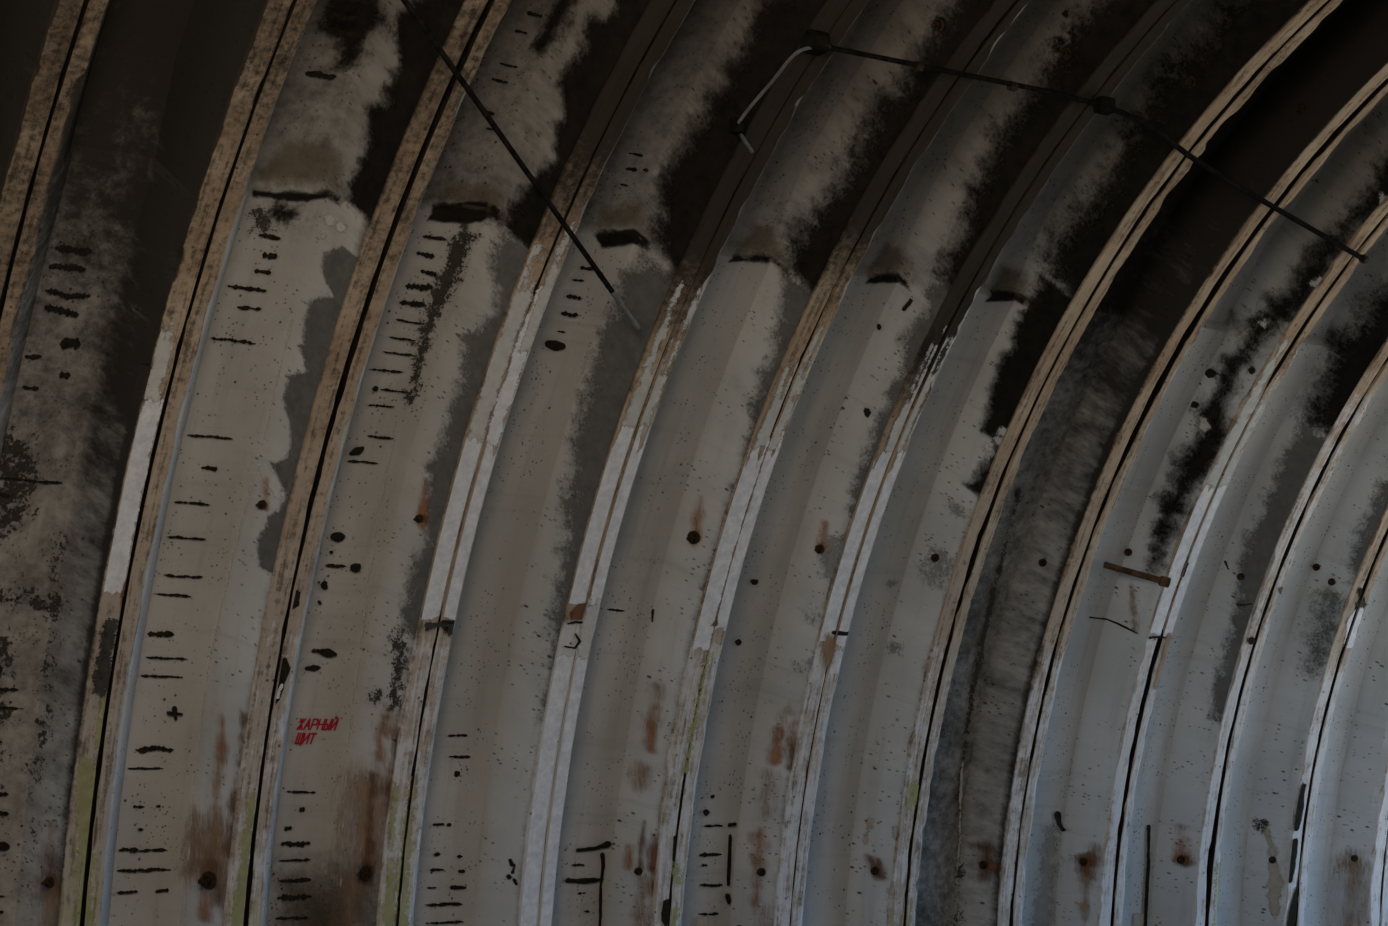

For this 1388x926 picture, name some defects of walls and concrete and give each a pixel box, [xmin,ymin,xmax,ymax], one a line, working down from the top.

leakage [963,269,1072,495]
leakage [0,420,46,554]
spalling [329,532,346,554]
leakage [0,531,69,860]
spalling [275,648,337,705]
rust [341,627,412,926]
rust [184,791,236,920]
rust [1075,849,1097,918]